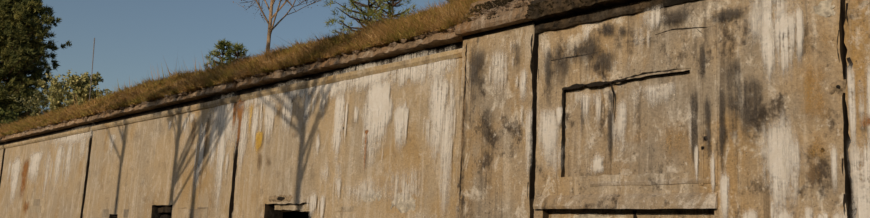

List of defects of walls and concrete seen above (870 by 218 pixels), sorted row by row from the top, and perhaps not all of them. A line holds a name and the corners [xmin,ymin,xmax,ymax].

leakage [711,0,803,75]
leakage [7,130,91,200]
rust [233,101,245,142]
leakage [182,43,526,207]
leakage [691,61,765,218]
leakage [762,117,820,218]
leakage [813,144,837,185]
crack [837,0,857,218]
leakage [847,67,870,218]
leakage [307,194,324,218]
leakage [805,208,845,218]